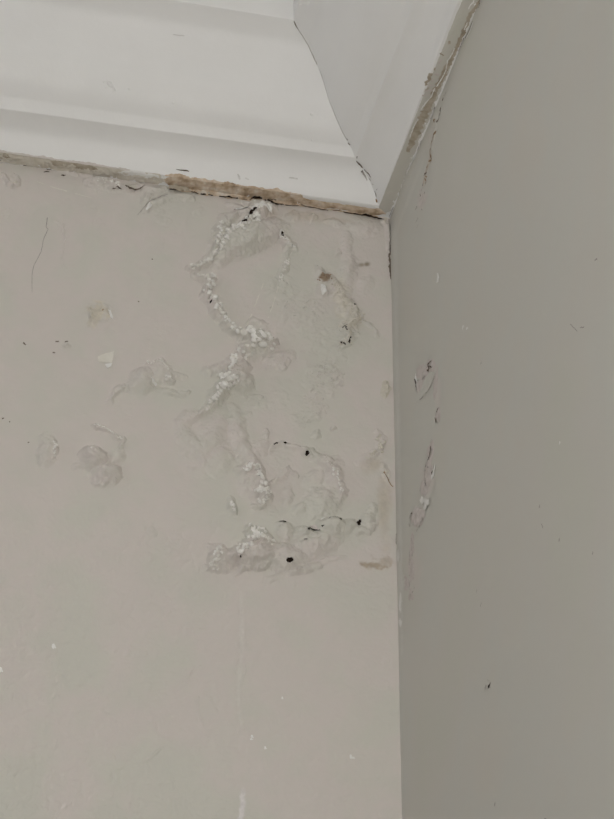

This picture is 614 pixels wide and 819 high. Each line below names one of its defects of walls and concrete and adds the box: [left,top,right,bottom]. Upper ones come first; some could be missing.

peeling [0,0,480,219]
crack [294,21,393,279]